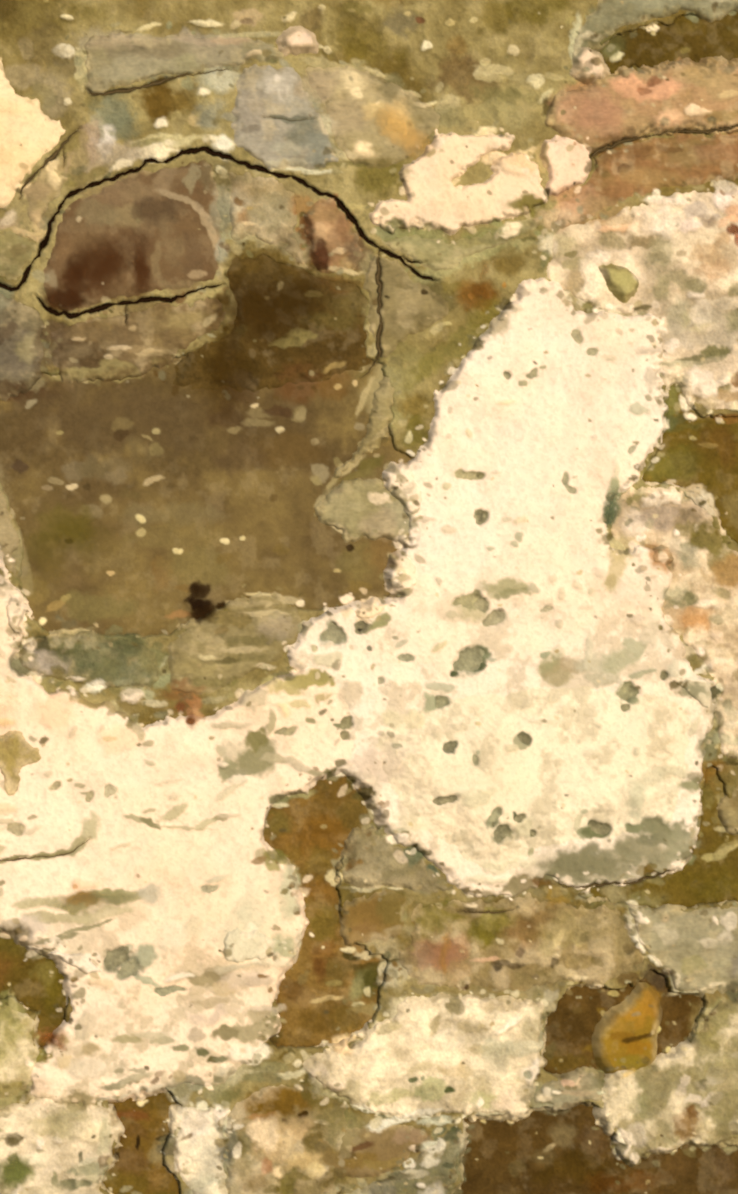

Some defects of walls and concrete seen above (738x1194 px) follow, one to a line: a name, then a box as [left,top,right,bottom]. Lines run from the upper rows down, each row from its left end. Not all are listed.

crack [0,129,439,379]
peeling [0,278,738,1194]